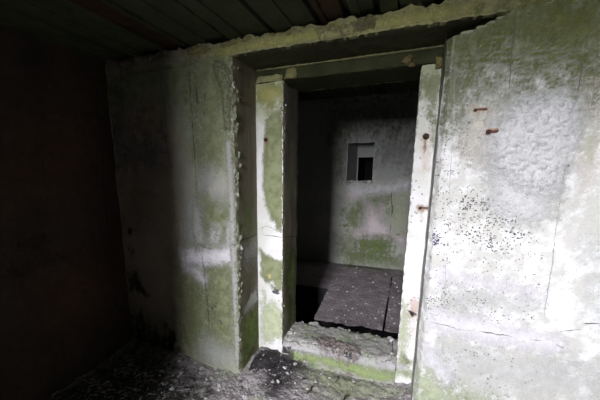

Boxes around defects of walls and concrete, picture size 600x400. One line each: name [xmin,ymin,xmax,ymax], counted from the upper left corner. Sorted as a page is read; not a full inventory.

leakage [180,169,242,372]